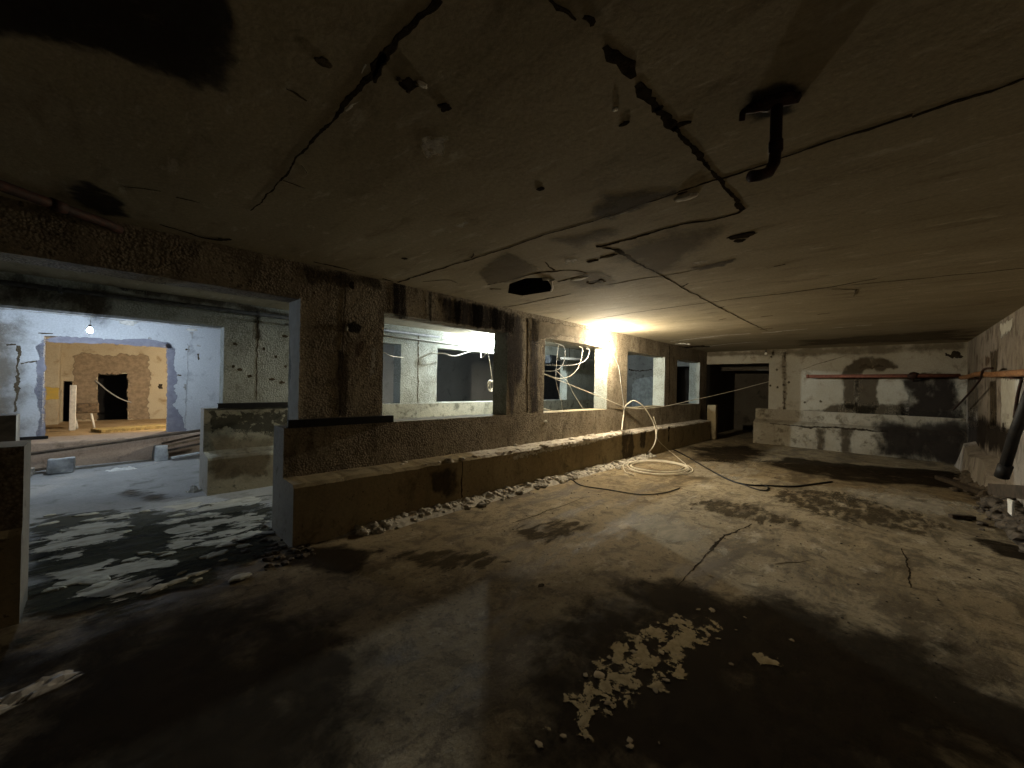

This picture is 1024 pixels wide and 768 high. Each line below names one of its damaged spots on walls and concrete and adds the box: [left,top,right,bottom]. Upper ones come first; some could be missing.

damp [0,0,238,89]
crack [250,0,443,211]
crack [383,0,1024,413]
crack [0,308,219,428]
damp [671,325,1009,536]
crack [679,524,752,584]
crack [791,506,912,588]